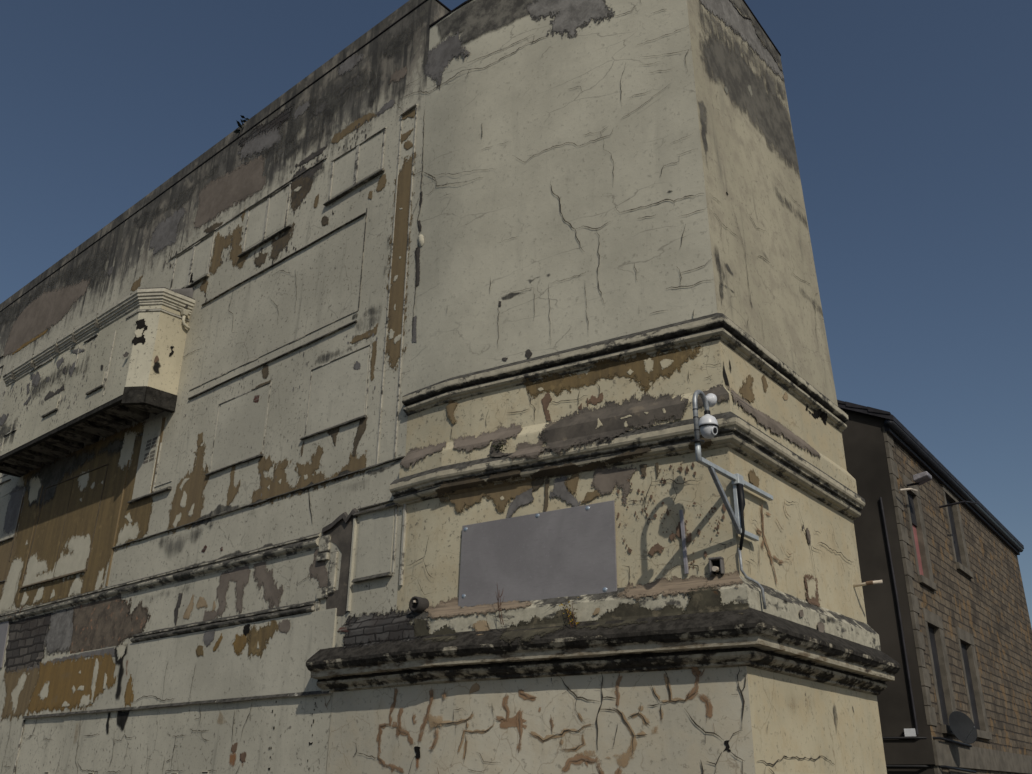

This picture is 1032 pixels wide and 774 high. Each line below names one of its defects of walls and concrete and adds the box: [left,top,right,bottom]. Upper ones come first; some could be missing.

water stain [0,248,108,325]
peeling [149,99,395,302]
peeling [346,109,423,393]
water stain [437,0,536,43]
crack [394,1,689,337]
crack [489,136,770,344]
water stain [698,0,800,176]
peeling [0,420,153,723]
peeling [167,406,368,534]
spalling [337,341,821,651]
crack [1,665,251,774]
crack [353,666,835,774]